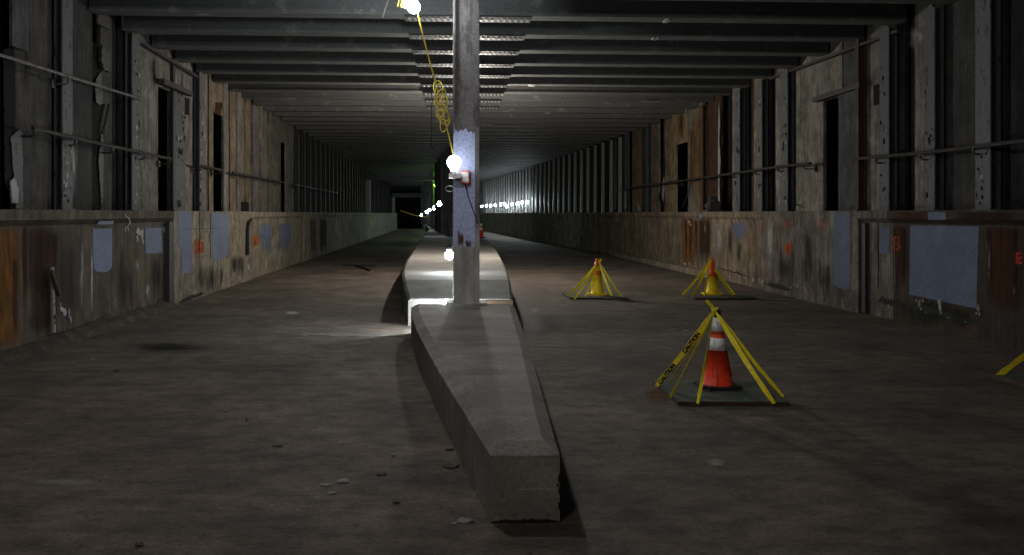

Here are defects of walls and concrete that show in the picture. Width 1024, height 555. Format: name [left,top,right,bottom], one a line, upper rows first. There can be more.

peeling [10,128,24,209]
corrosion [682,219,710,262]